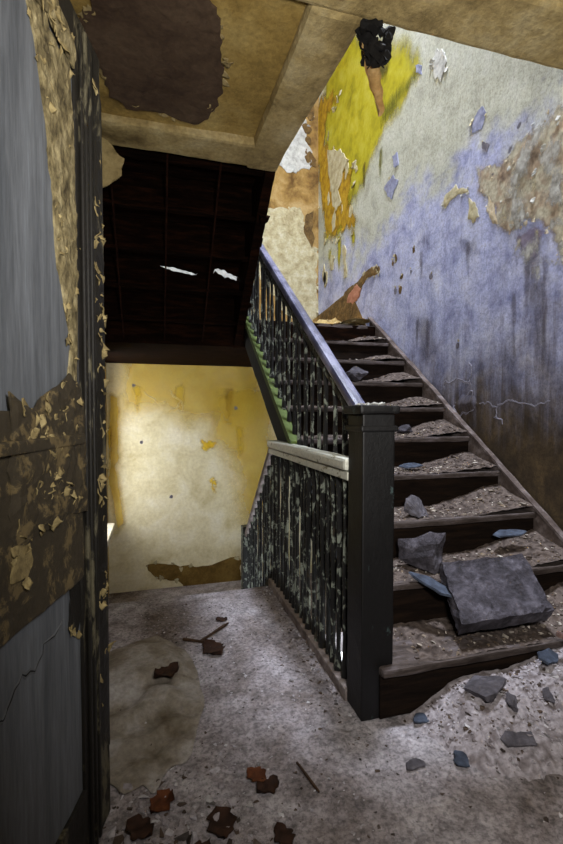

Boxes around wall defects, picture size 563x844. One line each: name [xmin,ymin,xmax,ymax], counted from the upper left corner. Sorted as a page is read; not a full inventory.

peeling [262,89,380,326]
peeling [364,63,385,117]
peeling [384,152,399,199]
flaking render [440,105,563,279]
flaking render [77,0,241,752]
crack [443,361,550,424]